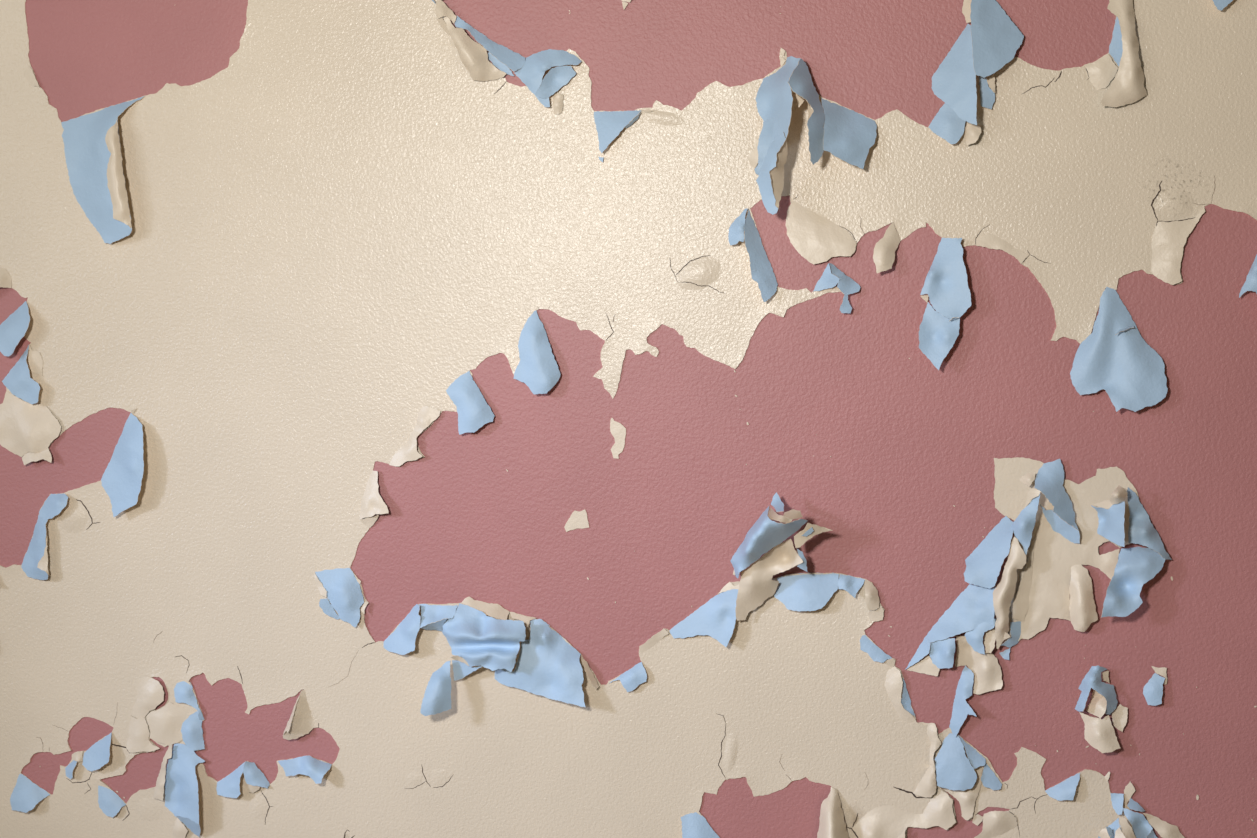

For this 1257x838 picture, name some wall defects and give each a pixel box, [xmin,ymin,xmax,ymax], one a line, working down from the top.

peeling [24,0,248,244]
crack [670,255,724,293]
peeling [0,267,144,580]
peeling [314,0,1257,838]
peeling [10,673,340,838]